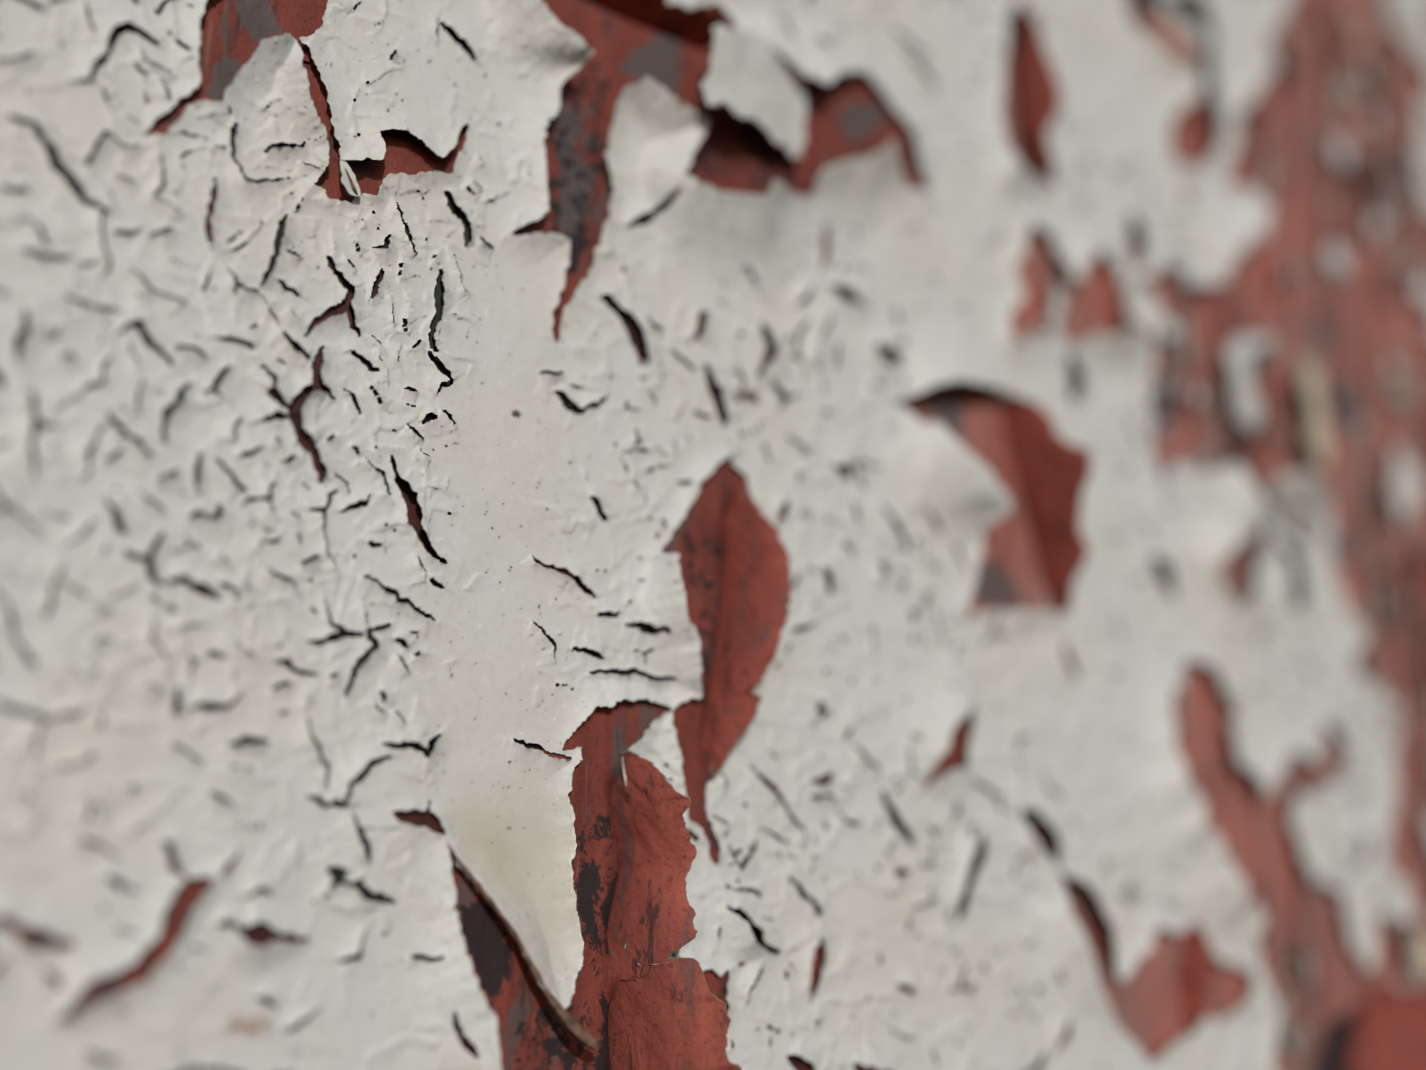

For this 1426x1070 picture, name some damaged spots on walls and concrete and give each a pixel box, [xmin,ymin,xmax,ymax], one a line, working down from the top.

crack [0,0,186,106]
crack [384,12,486,70]
peeling [116,0,947,365]
crack [534,277,876,434]
crack [0,92,517,906]
crack [582,489,612,528]
peeling [852,0,1426,1070]
crack [524,545,693,687]
peeling [0,434,839,1070]
crack [497,729,580,765]
crack [72,918,492,1070]
crack [782,1044,899,1070]